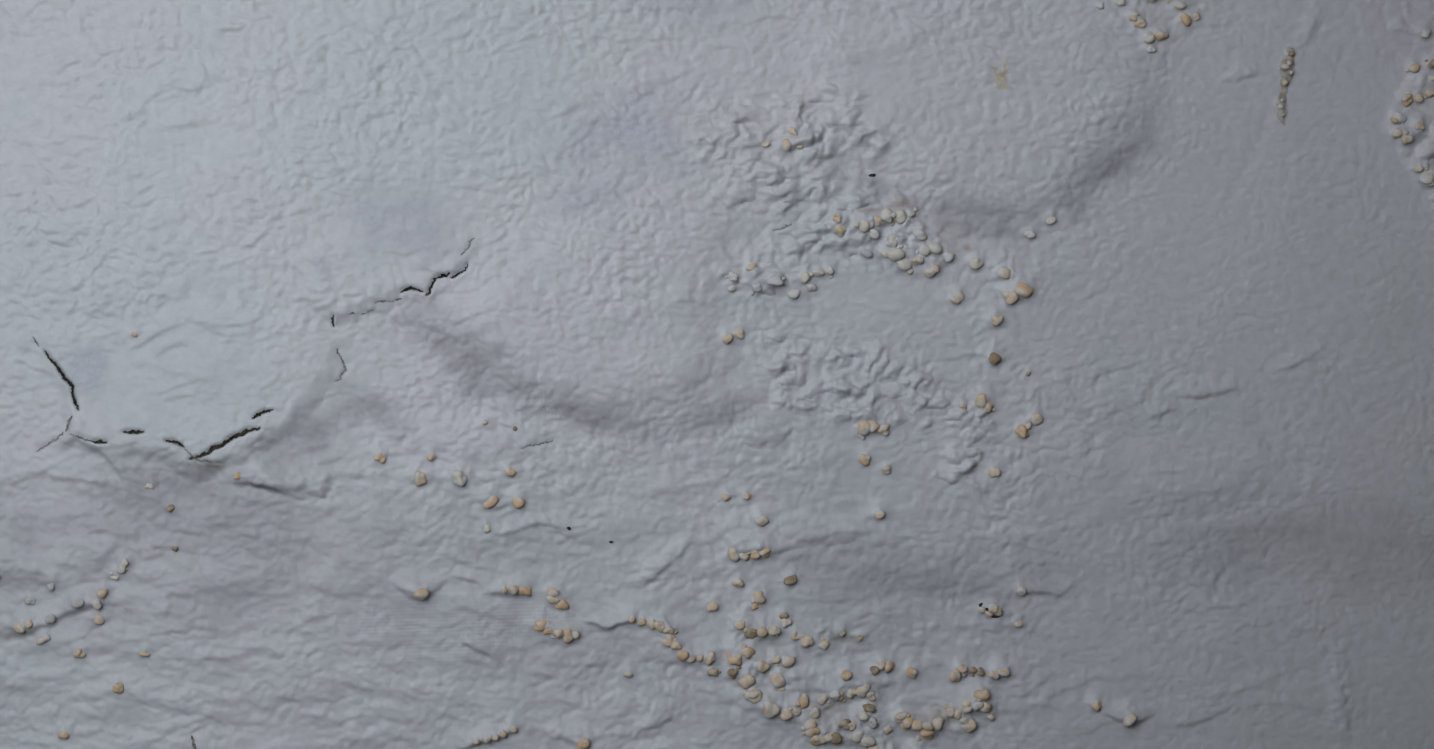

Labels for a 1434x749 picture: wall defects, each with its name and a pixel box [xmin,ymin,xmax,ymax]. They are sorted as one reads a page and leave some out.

crack [331,238,475,381]
crack [32,336,273,463]